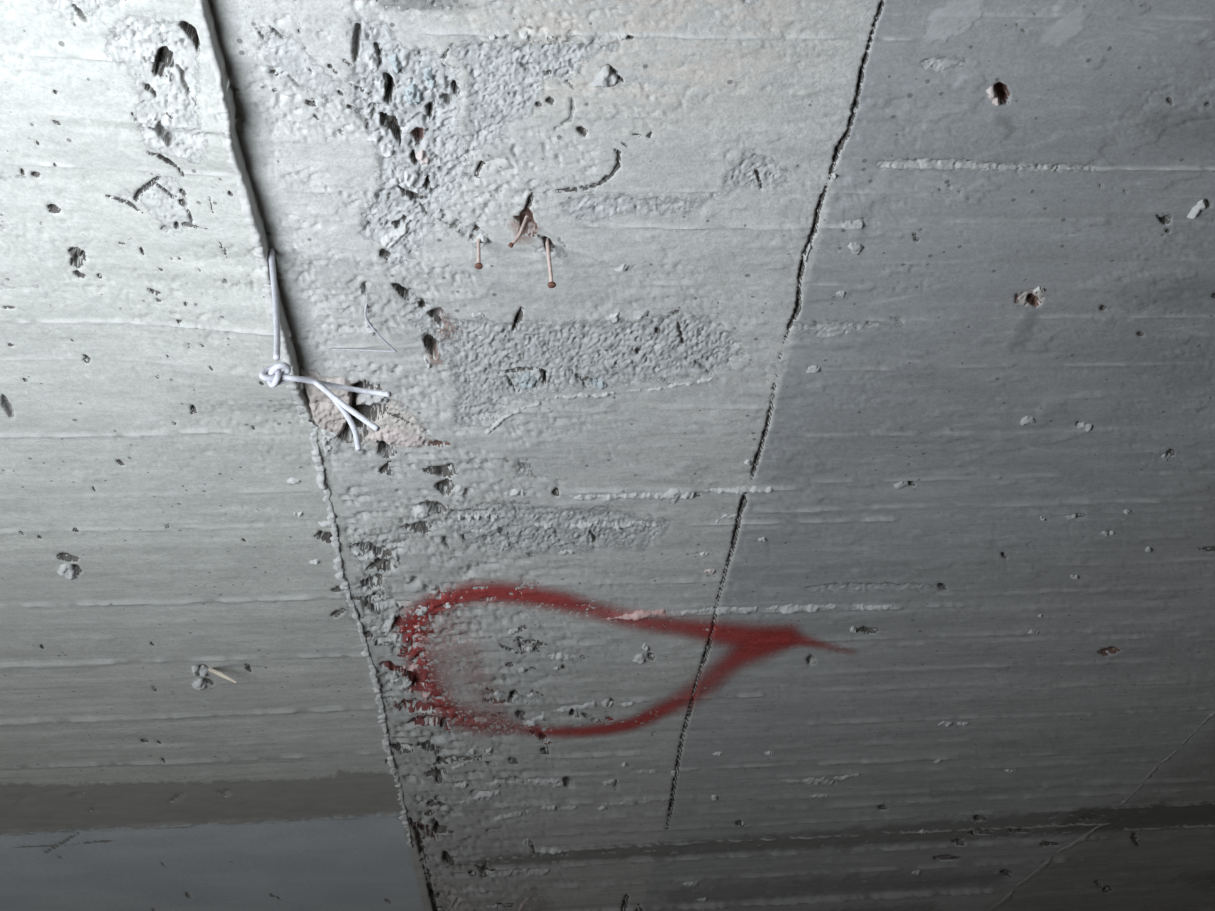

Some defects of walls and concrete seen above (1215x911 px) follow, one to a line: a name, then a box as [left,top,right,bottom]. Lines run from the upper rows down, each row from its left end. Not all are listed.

crack [556,131,652,193]
crack [665,0,885,829]